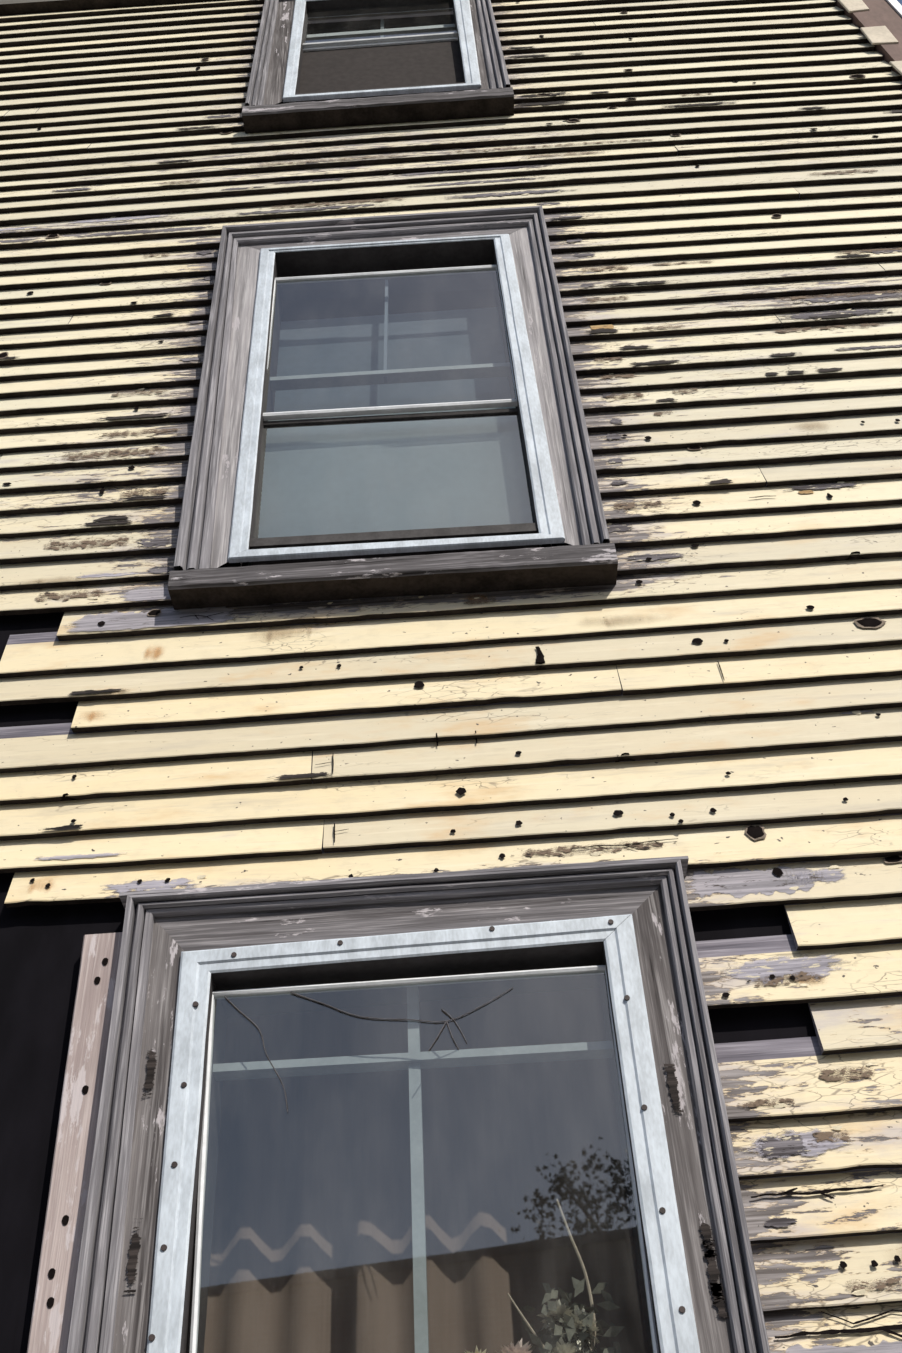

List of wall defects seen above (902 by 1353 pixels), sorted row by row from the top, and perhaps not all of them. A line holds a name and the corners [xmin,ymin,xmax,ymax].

peeling [0,226,40,243]
peeling [566,239,629,302]
peeling [772,289,902,333]
peeling [61,428,178,460]
peeling [120,488,167,498]
peeling [607,501,662,533]
peeling [45,537,175,550]
peeling [624,553,692,561]
peeling [35,565,173,602]
peeling [721,952,850,987]
crack [751,1185,883,1199]
crack [775,1309,902,1339]